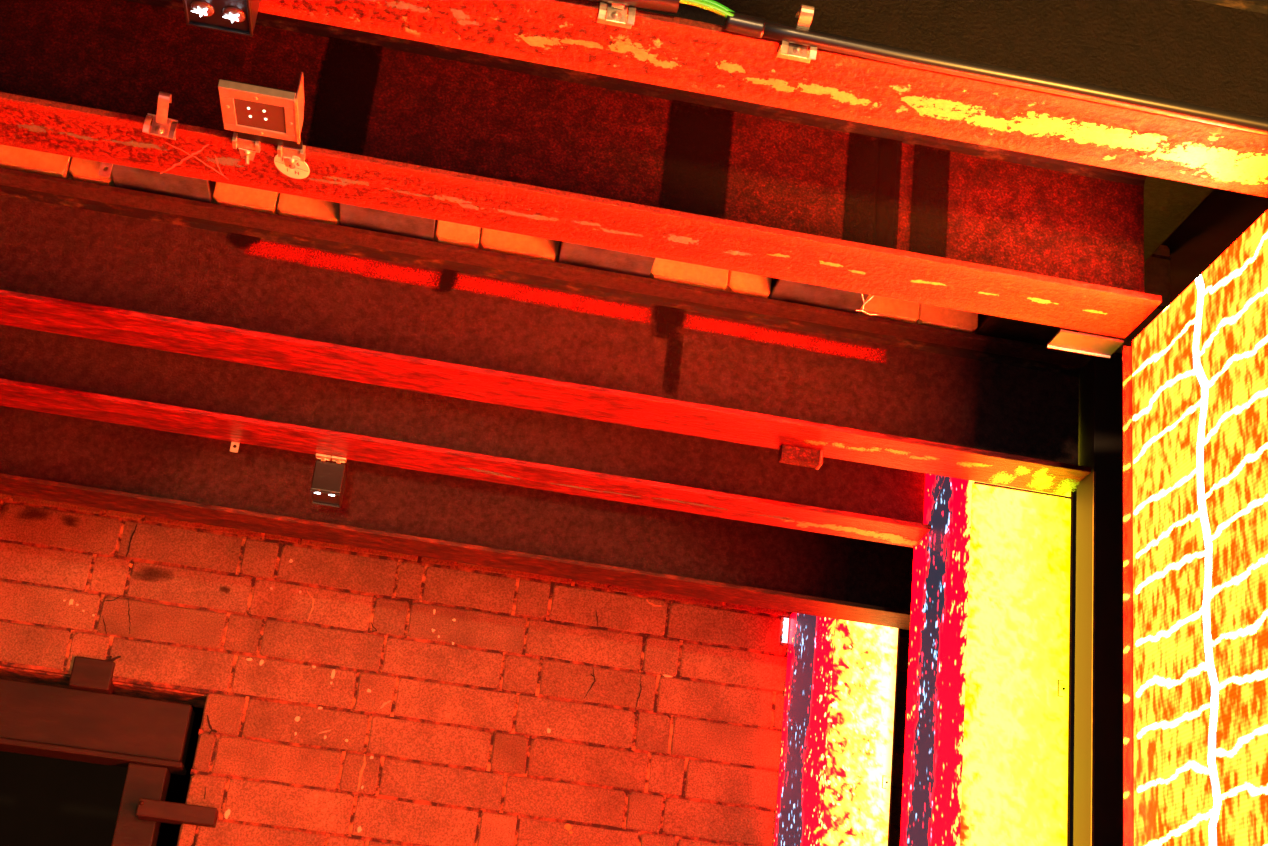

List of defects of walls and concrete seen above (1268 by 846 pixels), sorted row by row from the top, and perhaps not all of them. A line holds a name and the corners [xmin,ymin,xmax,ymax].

peeling [515,33,682,69]
peeling [716,60,881,108]
peeling [901,96,1268,187]